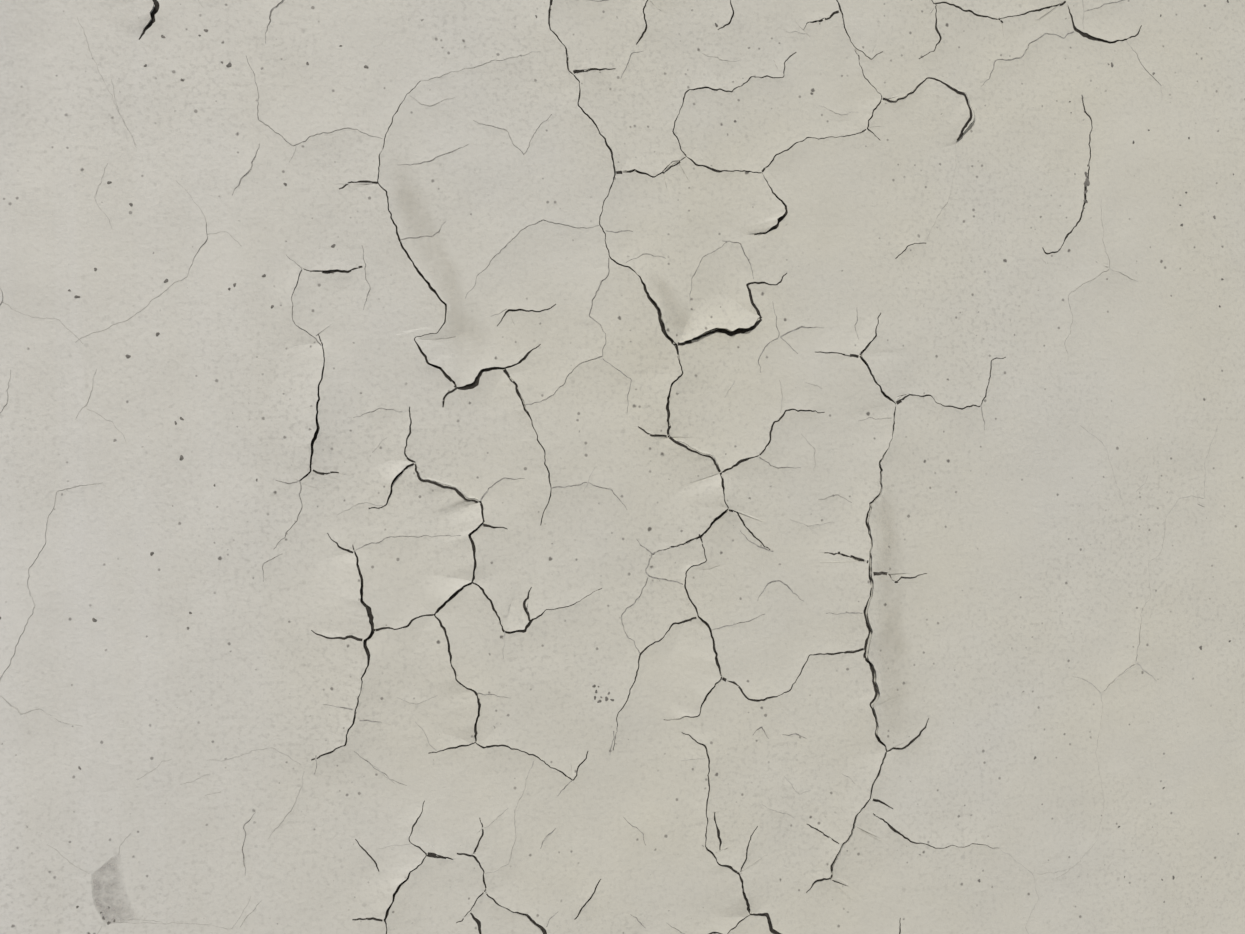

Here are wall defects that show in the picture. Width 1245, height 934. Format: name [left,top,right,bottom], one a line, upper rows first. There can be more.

peeling [94,0,311,50]
crack [216,52,383,205]
crack [465,103,599,335]
crack [591,0,853,189]
crack [908,0,1066,72]
peeling [971,0,1175,103]
crack [1040,92,1143,362]
peeling [256,0,1017,934]
crack [712,300,865,614]
crack [97,748,301,934]
crack [322,682,438,801]
crack [467,719,601,881]